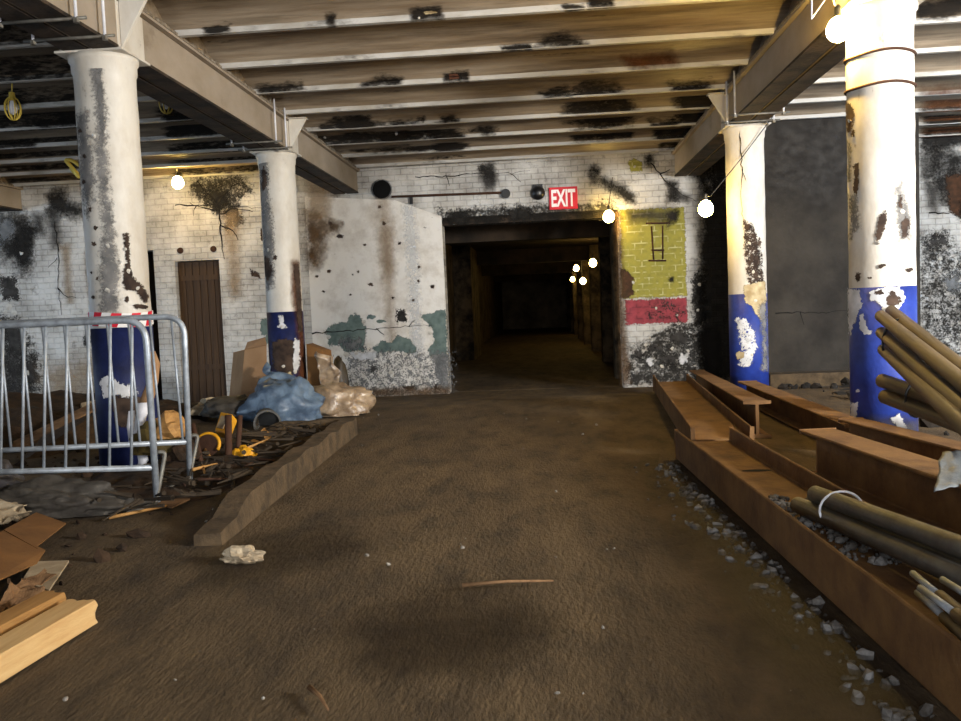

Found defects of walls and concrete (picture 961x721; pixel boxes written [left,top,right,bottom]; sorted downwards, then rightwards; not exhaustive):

leakage [13,211,70,298]
leakage [51,364,94,394]
leakage [204,187,244,294]
peeling [325,297,455,397]
peeling [734,219,769,372]
peeling [845,102,859,240]
peeling [850,389,860,417]
peeling [848,272,906,335]
peeling [875,181,961,354]
leakage [928,186,938,209]